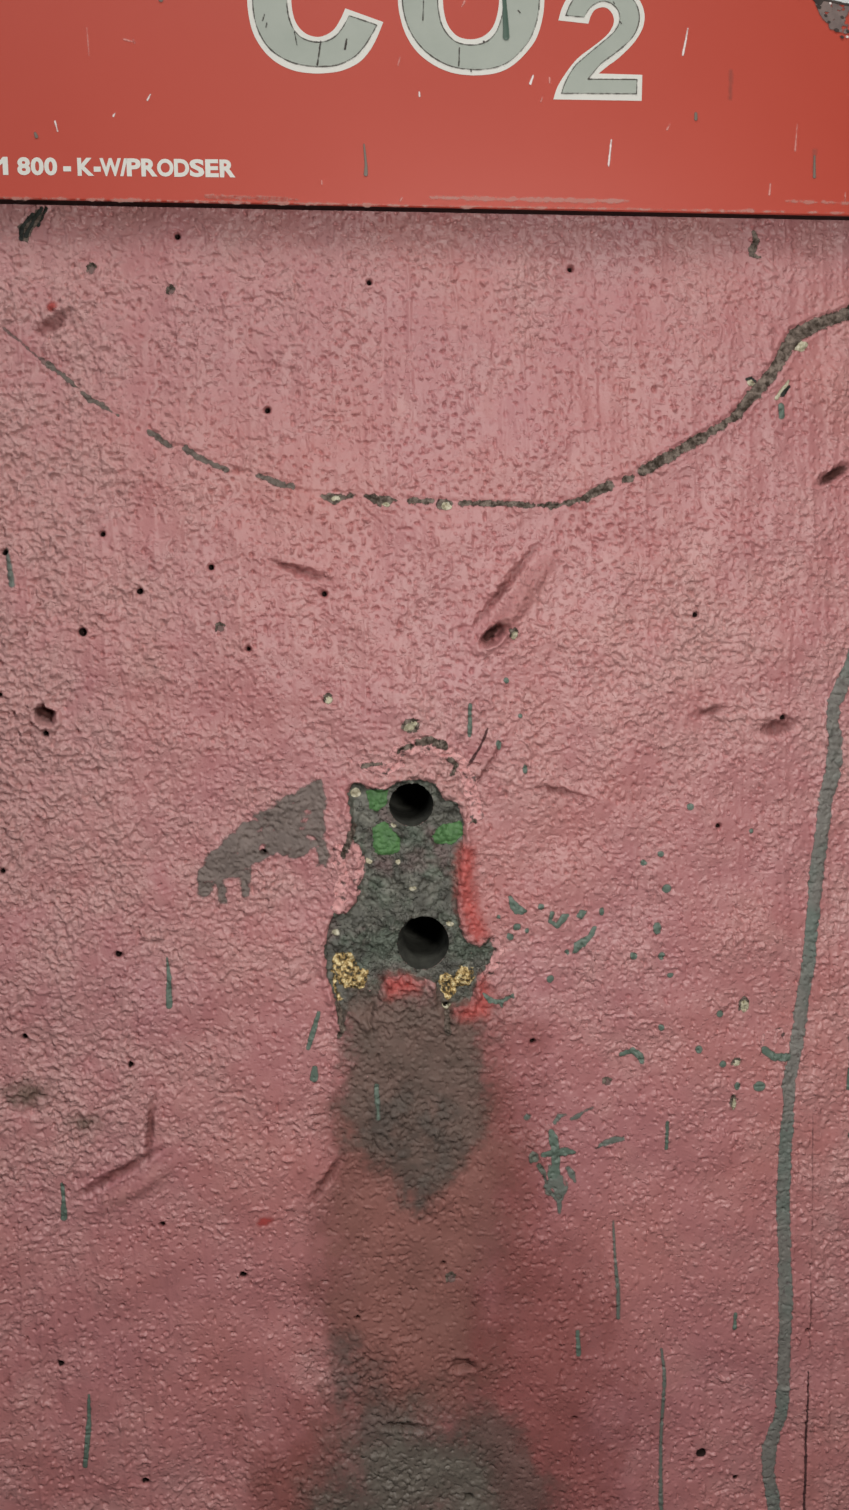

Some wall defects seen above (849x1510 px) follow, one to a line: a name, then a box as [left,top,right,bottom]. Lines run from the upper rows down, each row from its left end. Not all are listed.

crack [3,305,849,510]
spalling [324,718,504,1039]
crack [801,1371,809,1510]